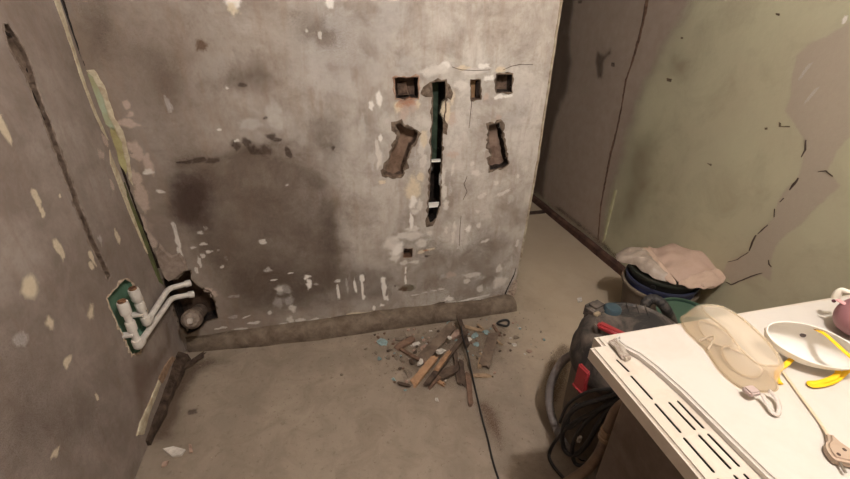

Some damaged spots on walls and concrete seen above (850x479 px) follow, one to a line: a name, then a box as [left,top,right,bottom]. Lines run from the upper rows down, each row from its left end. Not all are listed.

peeling [0,114,13,145]
spalling [2,22,142,358]
crack [54,0,163,285]
peeling [127,140,165,249]
spalling [229,101,293,158]
leakage [157,0,617,321]
crack [597,0,649,240]
peeling [267,283,319,324]
peeling [395,258,517,305]